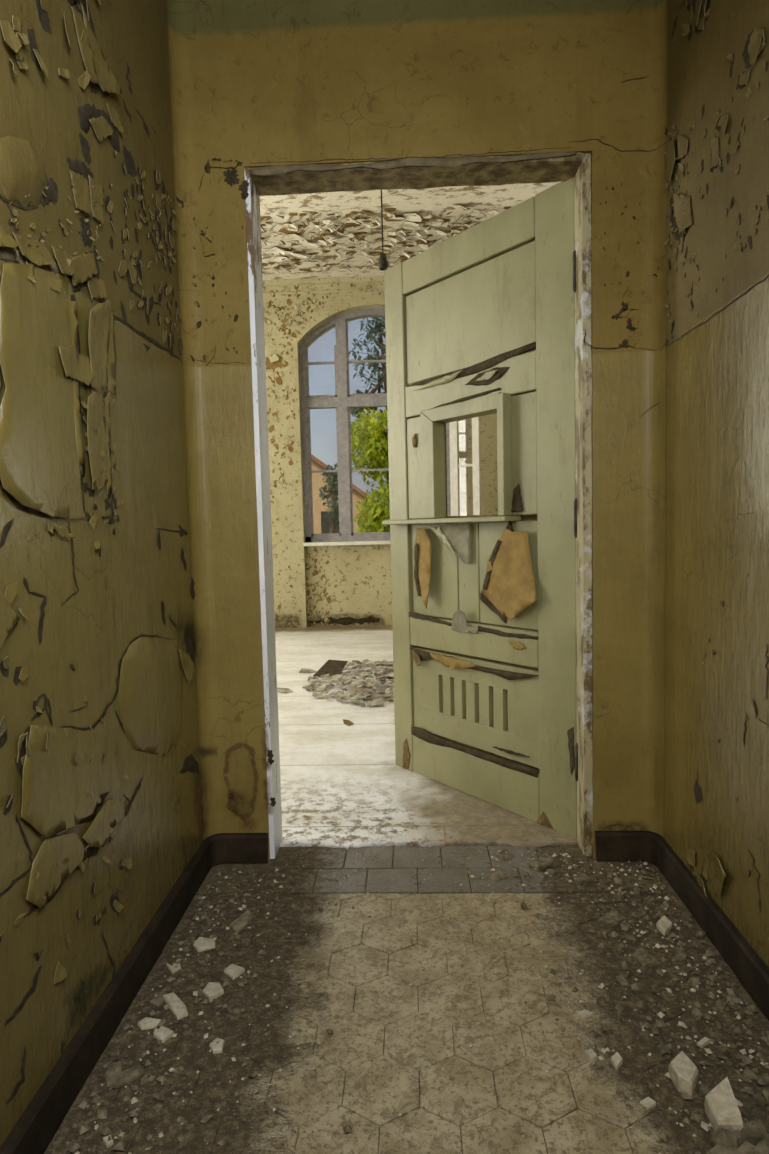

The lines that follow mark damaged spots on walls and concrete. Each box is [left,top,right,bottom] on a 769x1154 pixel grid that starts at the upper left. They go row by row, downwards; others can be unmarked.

peeling [0,0,245,558]
peeling [260,205,511,504]
flaking render [198,147,577,200]
peeling [653,27,769,317]
peeling [273,518,331,626]
peeling [0,700,132,943]
flaking render [150,992,188,1021]